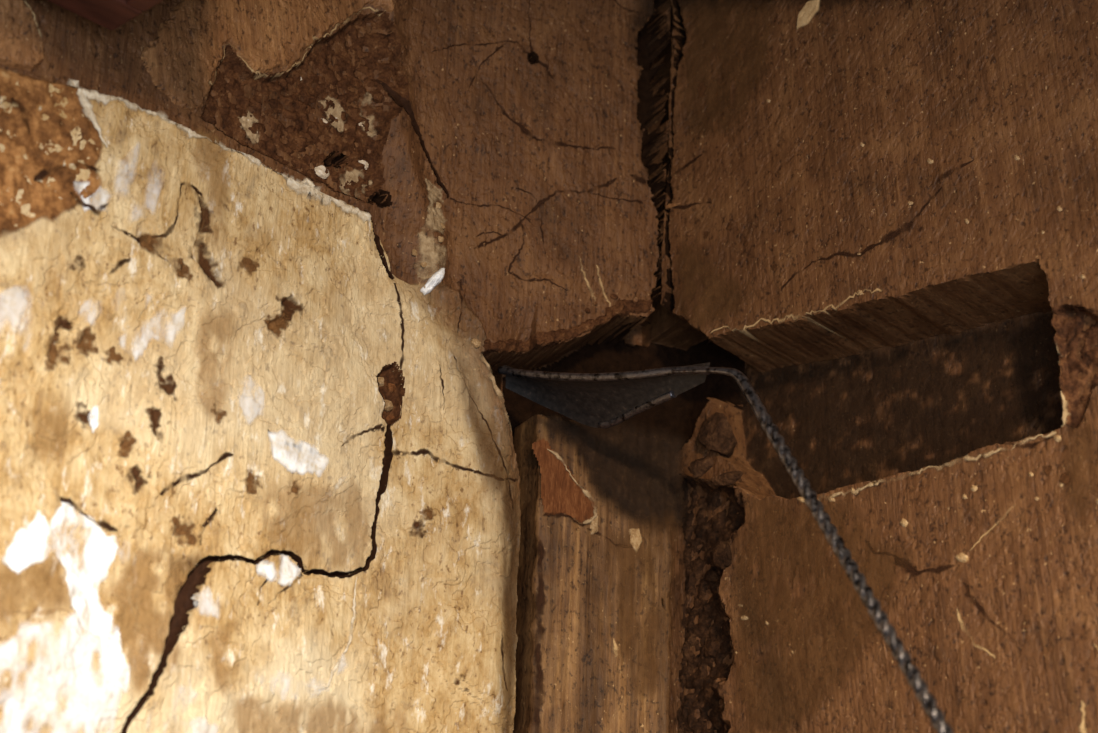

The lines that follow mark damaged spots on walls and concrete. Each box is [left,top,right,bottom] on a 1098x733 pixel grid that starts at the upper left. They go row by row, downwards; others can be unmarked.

spalling [0,0,409,236]
crack [375,0,712,312]
spalling [140,234,162,257]
crack [111,183,202,272]
spalling [176,190,223,288]
crack [364,210,405,369]
spalling [412,178,446,295]
flaking render [471,294,652,397]
spalling [1051,304,1098,442]
peeling [532,439,599,535]
crack [121,424,517,733]
flaking render [677,474,750,733]